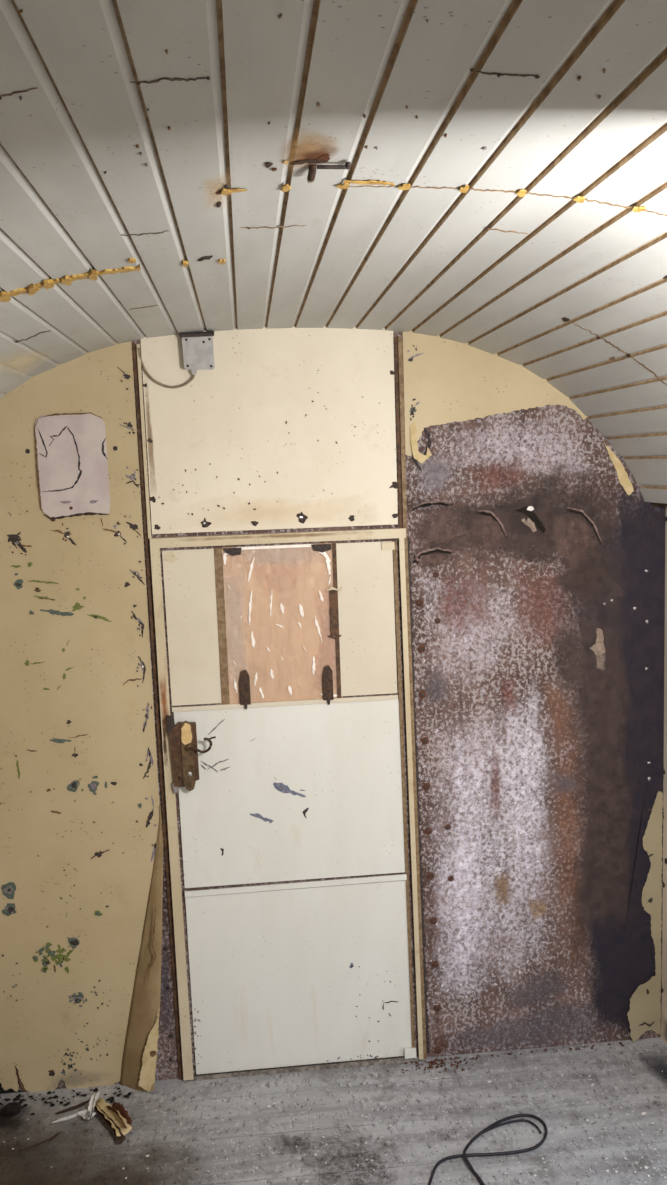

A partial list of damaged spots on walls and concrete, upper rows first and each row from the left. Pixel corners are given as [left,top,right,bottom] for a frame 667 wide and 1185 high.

crack [0,88,38,100]
crack [130,77,210,85]
corrosion [265,142,330,172]
crack [348,185,667,217]
peeling [7,532,32,556]
peeling [101,515,141,545]
peeling [123,656,146,687]
peeling [389,398,667,1057]
peeling [139,747,153,779]
corrosion [497,879,508,900]